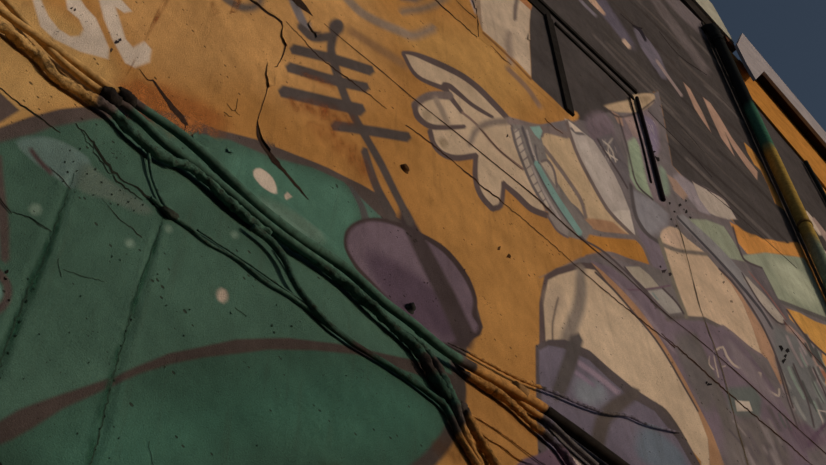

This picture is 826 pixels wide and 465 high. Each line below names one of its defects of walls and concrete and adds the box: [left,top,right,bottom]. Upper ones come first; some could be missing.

crack [0,86,164,465]
crack [250,0,826,465]